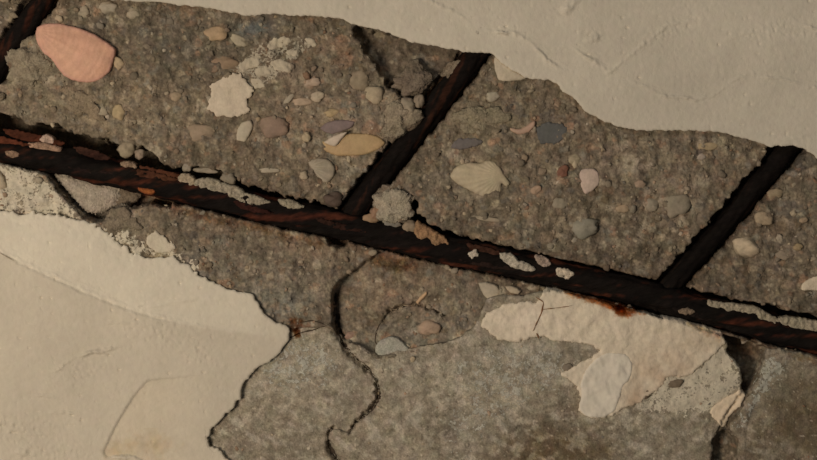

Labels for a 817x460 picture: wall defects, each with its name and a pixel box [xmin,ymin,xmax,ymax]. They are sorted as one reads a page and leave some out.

spalling [0,0,462,211]
spalling [389,53,775,282]
crack [290,300,381,460]
spalling [0,148,817,460]
crack [375,304,446,345]
rust [579,294,642,316]